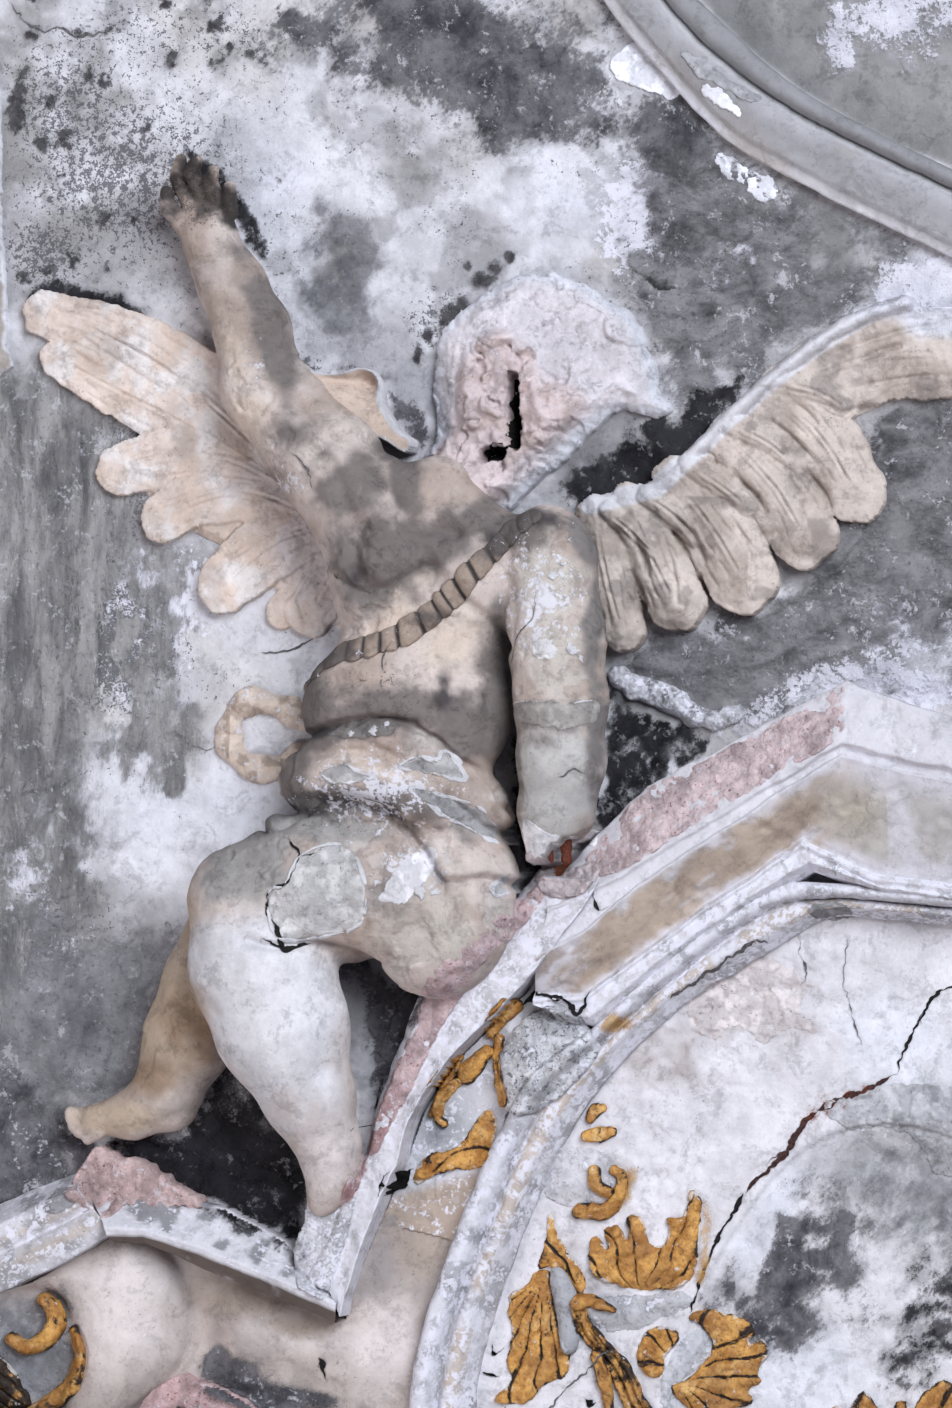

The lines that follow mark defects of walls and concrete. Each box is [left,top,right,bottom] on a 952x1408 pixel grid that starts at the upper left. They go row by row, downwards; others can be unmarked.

water stain [206,0,255,70]
water stain [275,7,335,48]
water stain [5,66,73,154]
peeling [704,153,792,206]
crack [263,839,323,953]
peeling [267,842,450,943]
spalling [340,687,845,1207]
crack [671,939,807,998]
crack [843,937,863,1045]
spalling [65,1145,208,1218]
crack [690,986,952,1312]
water stain [756,1214,808,1309]